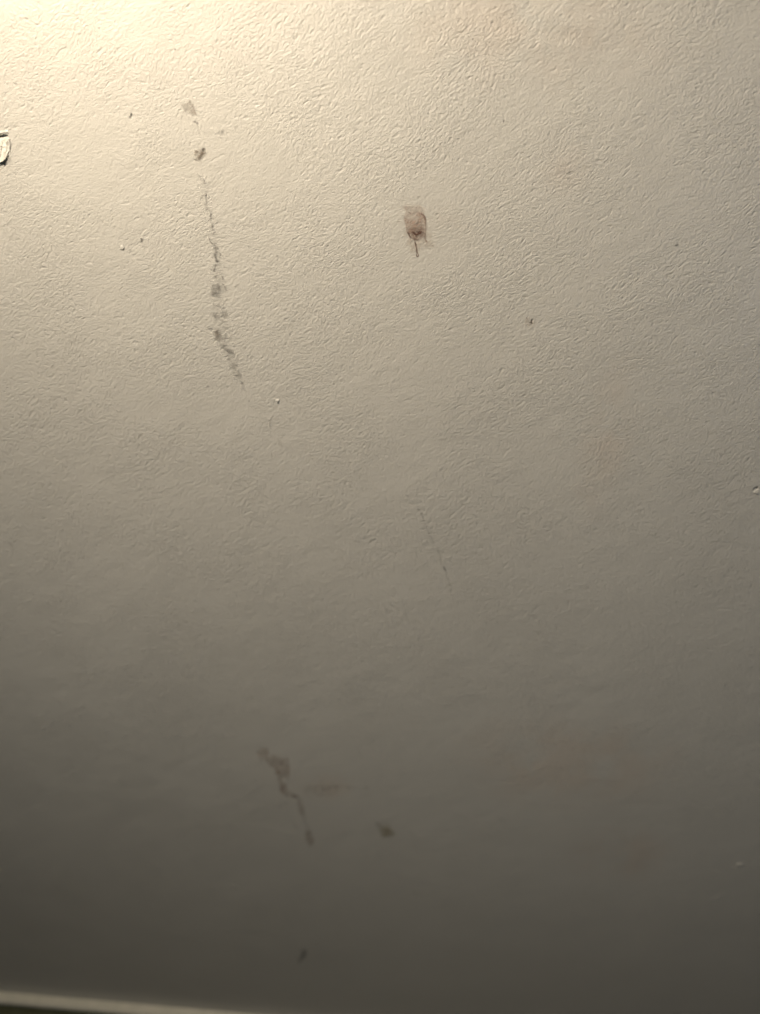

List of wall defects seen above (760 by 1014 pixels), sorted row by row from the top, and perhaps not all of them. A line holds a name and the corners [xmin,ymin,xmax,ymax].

peeling [0,130,11,162]